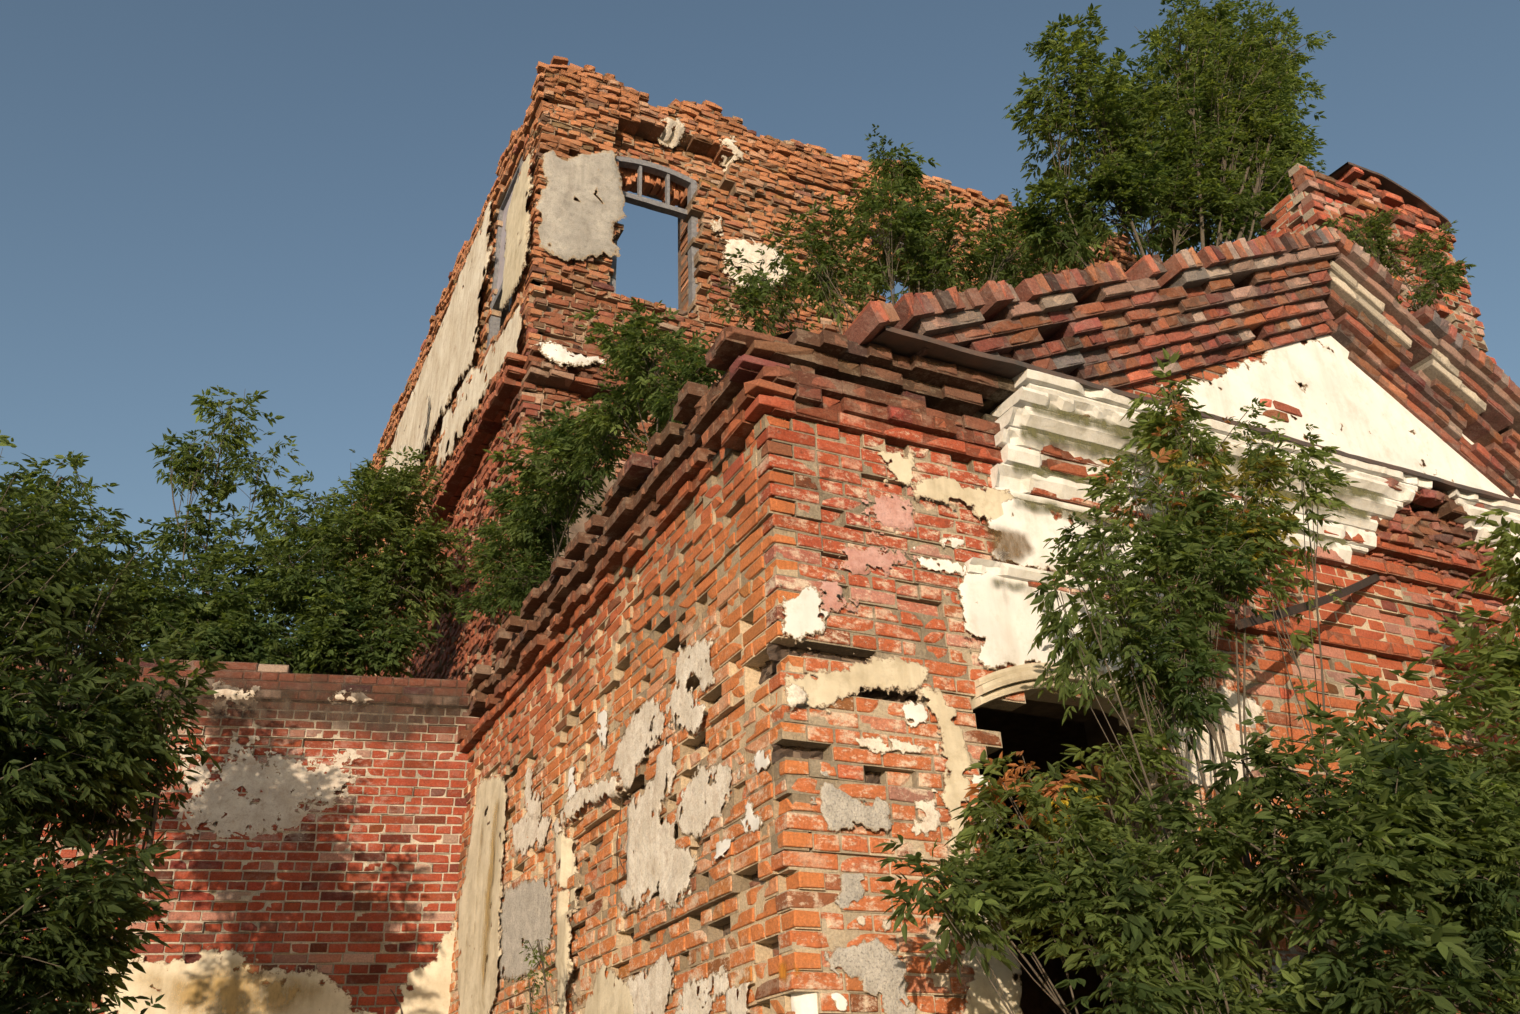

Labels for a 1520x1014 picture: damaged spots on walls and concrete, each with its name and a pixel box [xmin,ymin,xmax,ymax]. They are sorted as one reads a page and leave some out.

flaking render [709,211,792,289]
flaking render [381,149,626,475]
flaking render [1160,334,1520,607]
flaking render [207,678,260,716]
flaking render [328,688,373,704]
flaking render [395,450,1264,1014]
flaking render [172,735,364,858]
flaking render [98,945,377,1014]